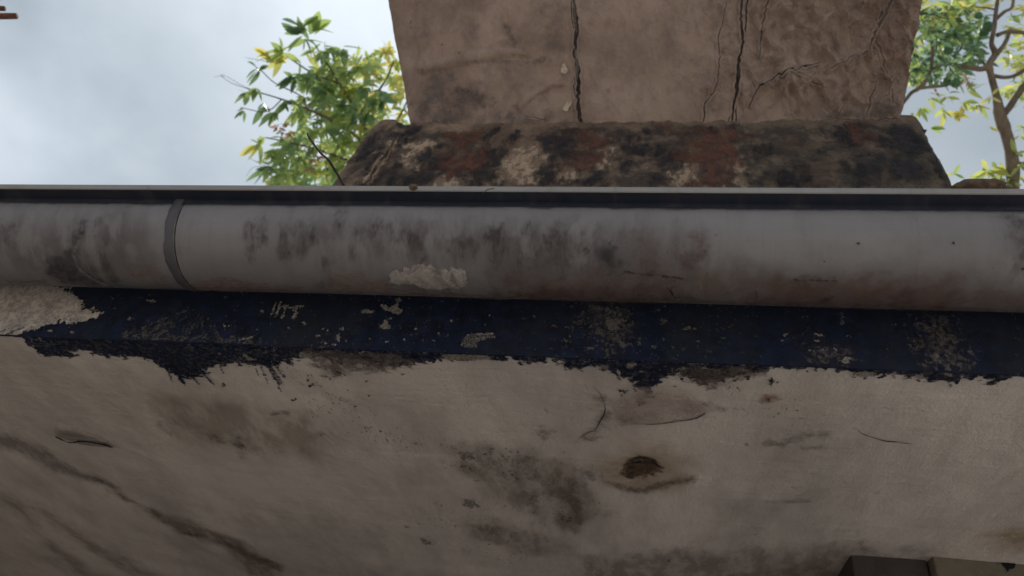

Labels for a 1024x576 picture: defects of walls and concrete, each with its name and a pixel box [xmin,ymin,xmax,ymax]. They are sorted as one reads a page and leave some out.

crack [569,0,585,123]
crack [700,0,823,123]
damp [351,122,520,187]
damp [535,121,949,187]
peeling [0,285,104,335]
peeling [123,310,262,361]
peeling [260,301,307,329]
peeling [361,297,403,343]
peeling [442,333,495,361]
peeling [800,312,875,378]
peeling [904,314,976,380]